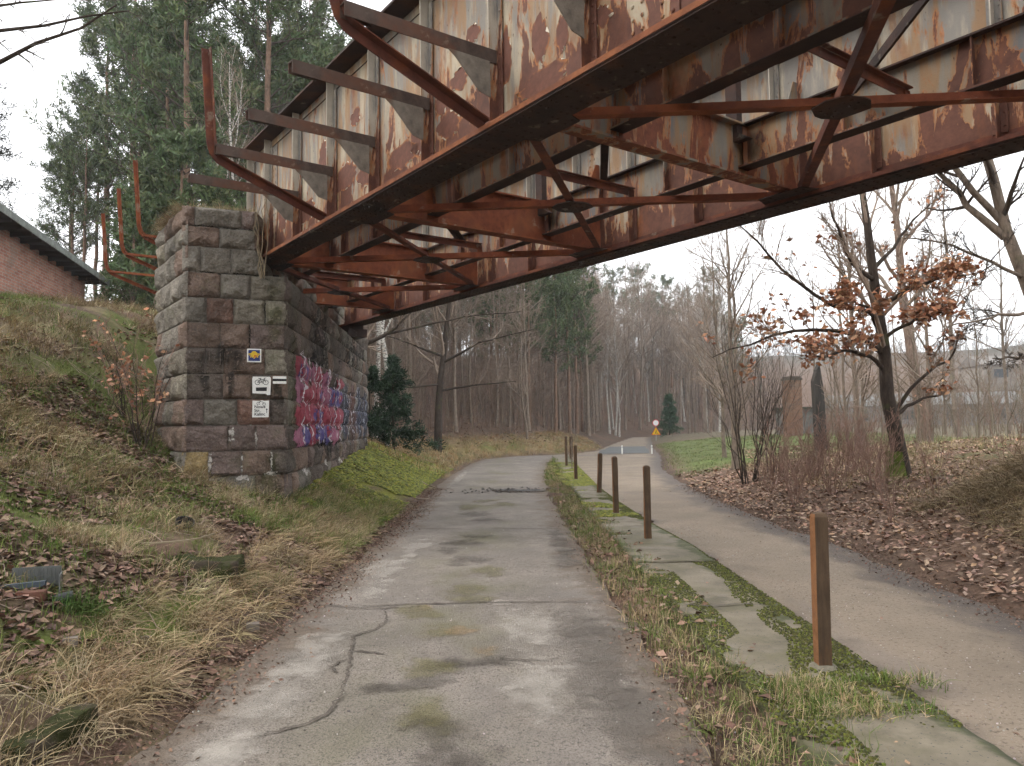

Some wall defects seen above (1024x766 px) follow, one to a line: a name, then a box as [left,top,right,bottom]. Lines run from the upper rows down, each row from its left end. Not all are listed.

peeling [466,23,481,43]
peeling [503,25,512,87]
peeling [516,11,569,101]
peeling [449,66,468,91]
peeling [350,106,360,127]
peeling [435,99,461,140]
crack [254,600,600,737]